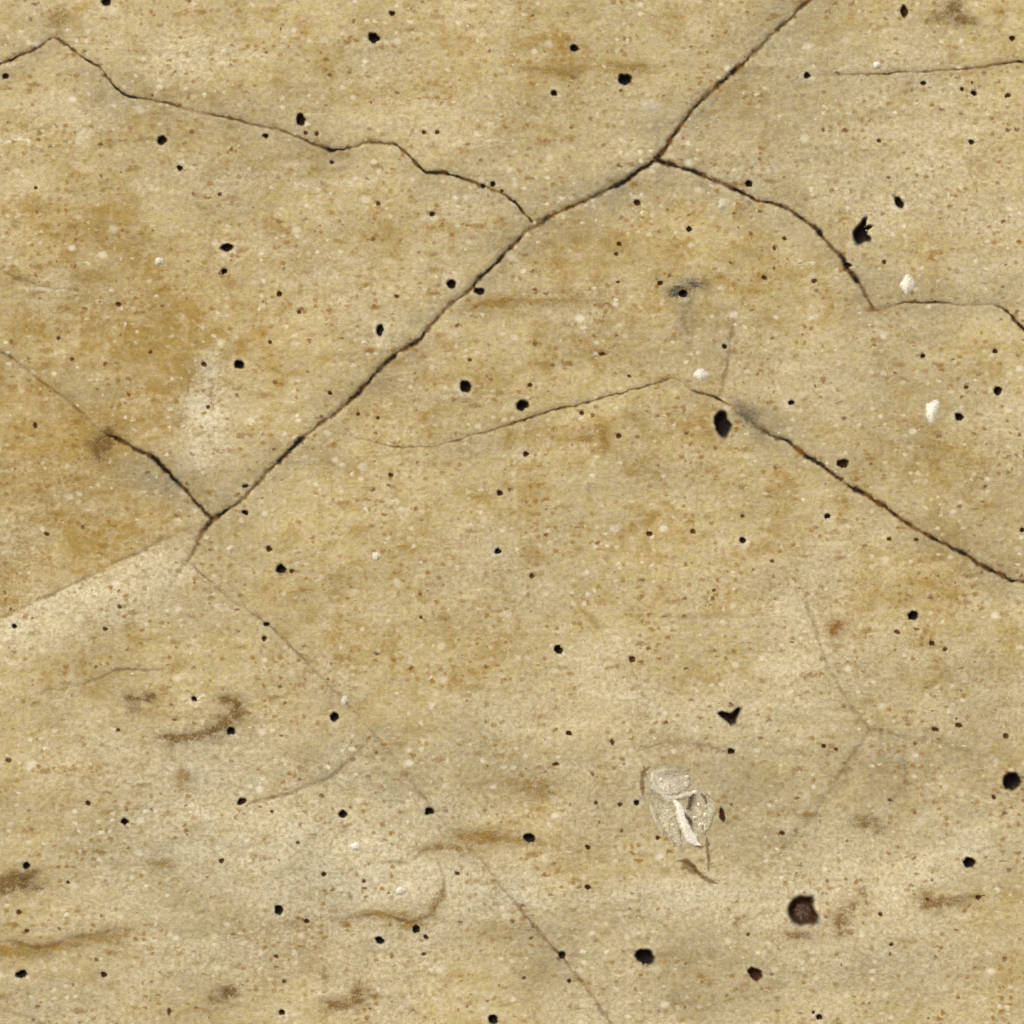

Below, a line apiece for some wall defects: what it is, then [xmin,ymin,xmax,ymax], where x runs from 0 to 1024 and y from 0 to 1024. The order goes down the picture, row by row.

crack [0,37,179,107]
crack [872,60,1024,75]
crack [108,0,874,536]
crack [902,297,949,305]
crack [1000,306,1024,330]
crack [762,429,1024,583]
spalling [649,769,714,846]